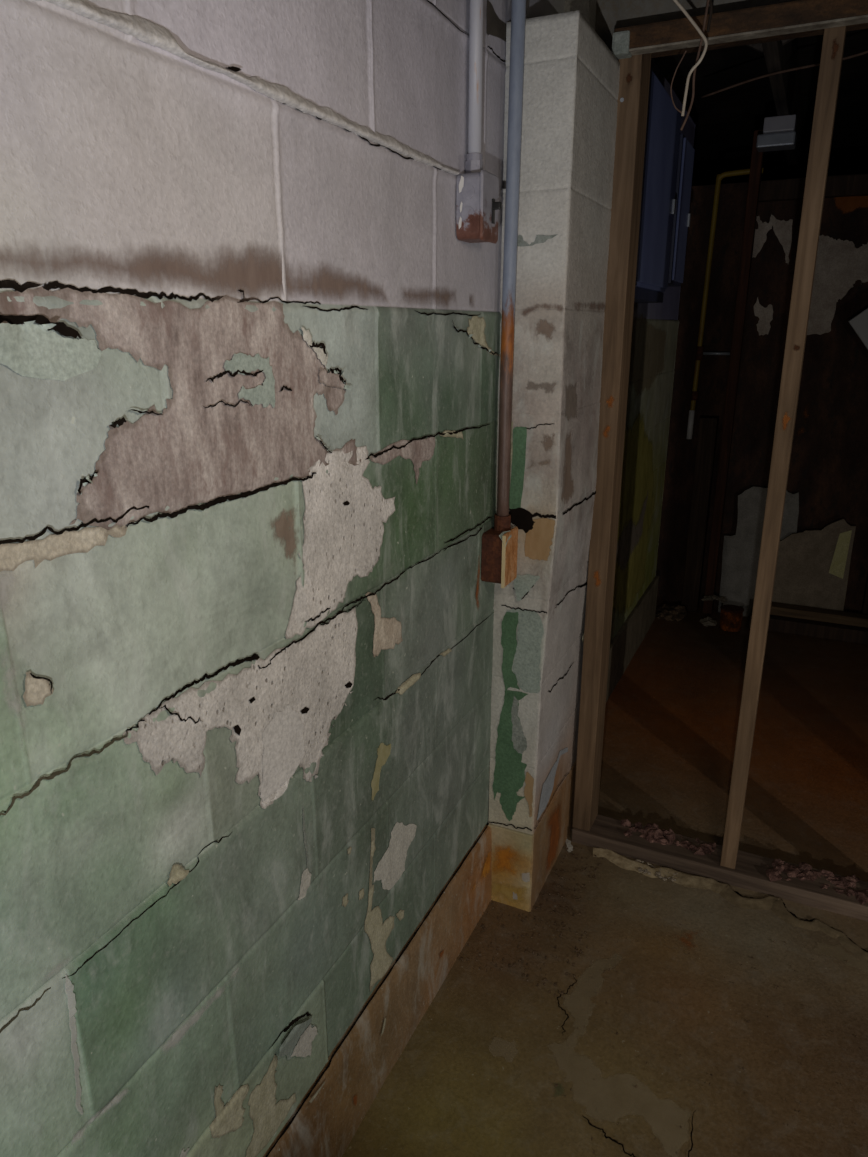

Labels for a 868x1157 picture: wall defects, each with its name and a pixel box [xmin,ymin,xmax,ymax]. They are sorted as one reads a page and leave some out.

crack [0,279,368,312]
damp [0,249,382,298]
peeling [752,215,793,263]
peeling [807,235,868,335]
crack [366,424,490,484]
crack [0,472,317,544]
peeling [0,287,403,809]
crack [0,492,596,815]
peeling [492,574,544,821]
crack [0,832,232,1033]
peeling [342,822,417,991]
peeling [209,1055,325,1157]